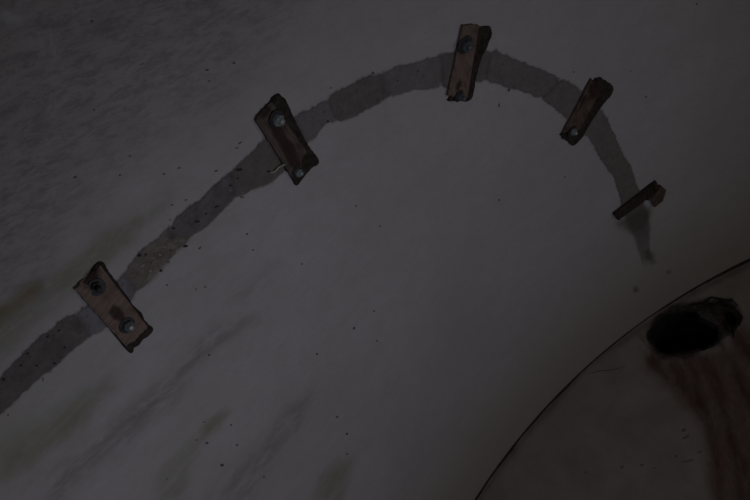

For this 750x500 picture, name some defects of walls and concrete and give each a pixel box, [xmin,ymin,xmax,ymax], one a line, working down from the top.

spalling [636,296,743,359]